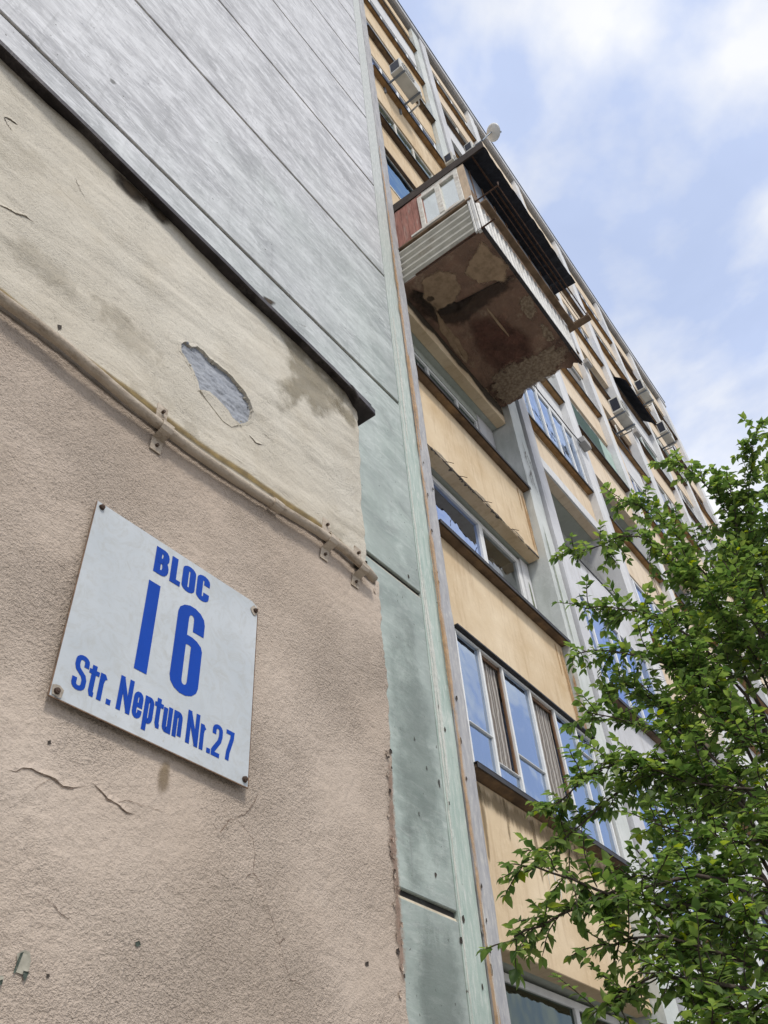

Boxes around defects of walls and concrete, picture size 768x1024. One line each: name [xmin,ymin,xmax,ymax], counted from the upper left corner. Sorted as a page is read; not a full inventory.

damp [412,277,510,324]
peeling [422,243,509,363]
spalling [178,339,255,428]
spalling [491,324,565,404]
crack [7,761,164,815]